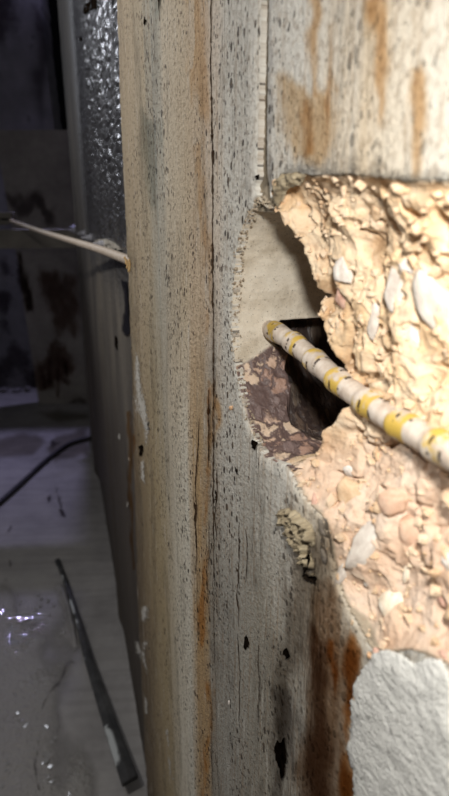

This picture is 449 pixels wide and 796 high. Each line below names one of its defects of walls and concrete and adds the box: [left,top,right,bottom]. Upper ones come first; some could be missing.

crack [193,0,221,796]
spalling [271,172,449,431]
crack [236,533,260,721]
spalling [275,405,449,666]